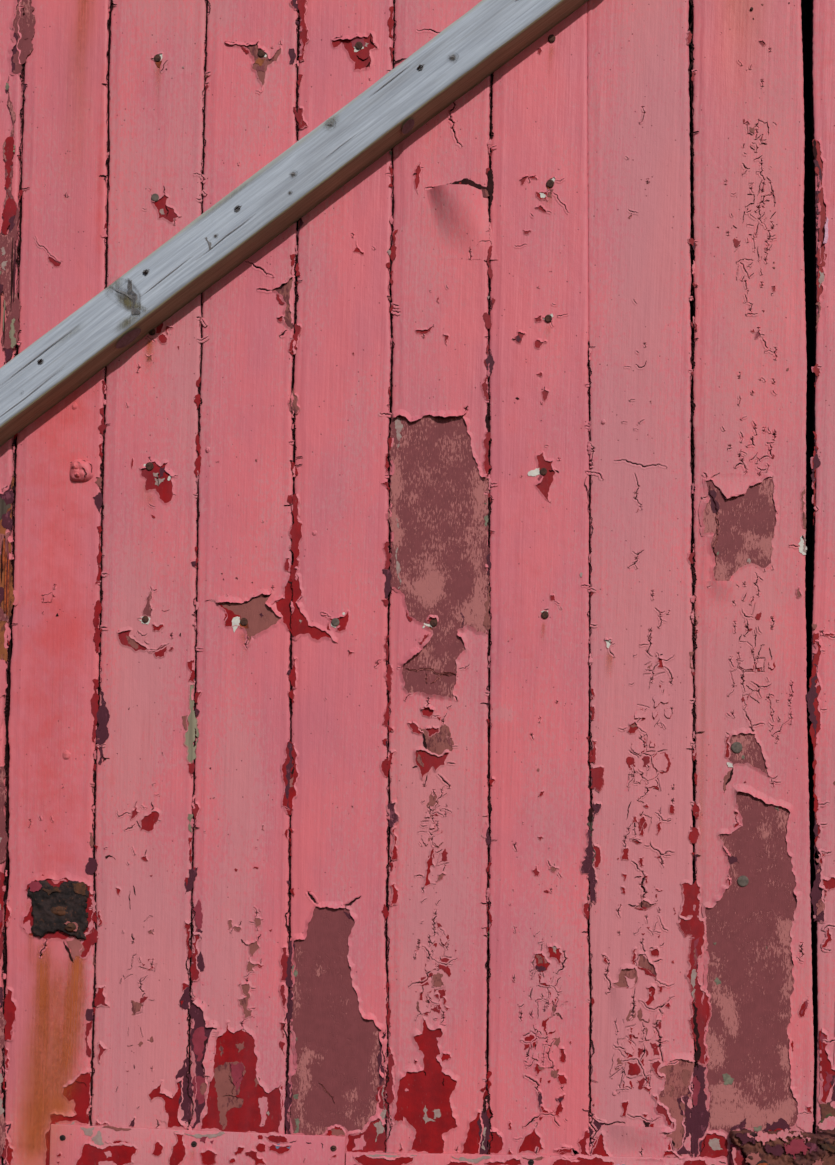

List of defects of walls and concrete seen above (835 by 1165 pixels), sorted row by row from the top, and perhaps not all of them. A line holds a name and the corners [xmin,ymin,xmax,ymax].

crack [724,113,777,313]
peeling [0,474,18,698]
peeling [193,493,355,656]
peeling [374,409,492,788]
crack [626,548,674,837]
crack [701,368,789,500]
crack [707,565,794,744]
peeling [687,431,821,581]
peeling [0,870,99,962]
corrosion [62,956,83,1075]
peeling [74,619,835,1165]
crack [385,888,669,1095]